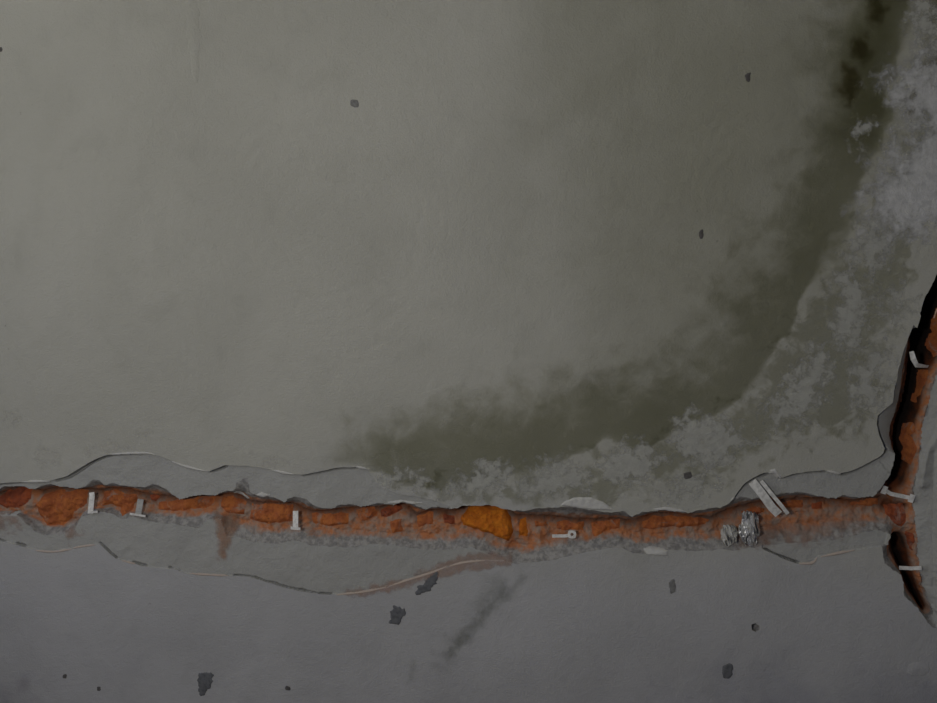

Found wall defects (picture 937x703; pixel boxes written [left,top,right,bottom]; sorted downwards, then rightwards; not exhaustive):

damp [764,0,937,435]
flaking render [925,308,937,357]
spalling [0,452,620,541]
damp [381,458,513,500]
damp [518,438,667,499]
flaking render [642,507,709,529]
damp [668,407,760,505]
spalling [731,325,937,627]
spalling [415,571,439,595]